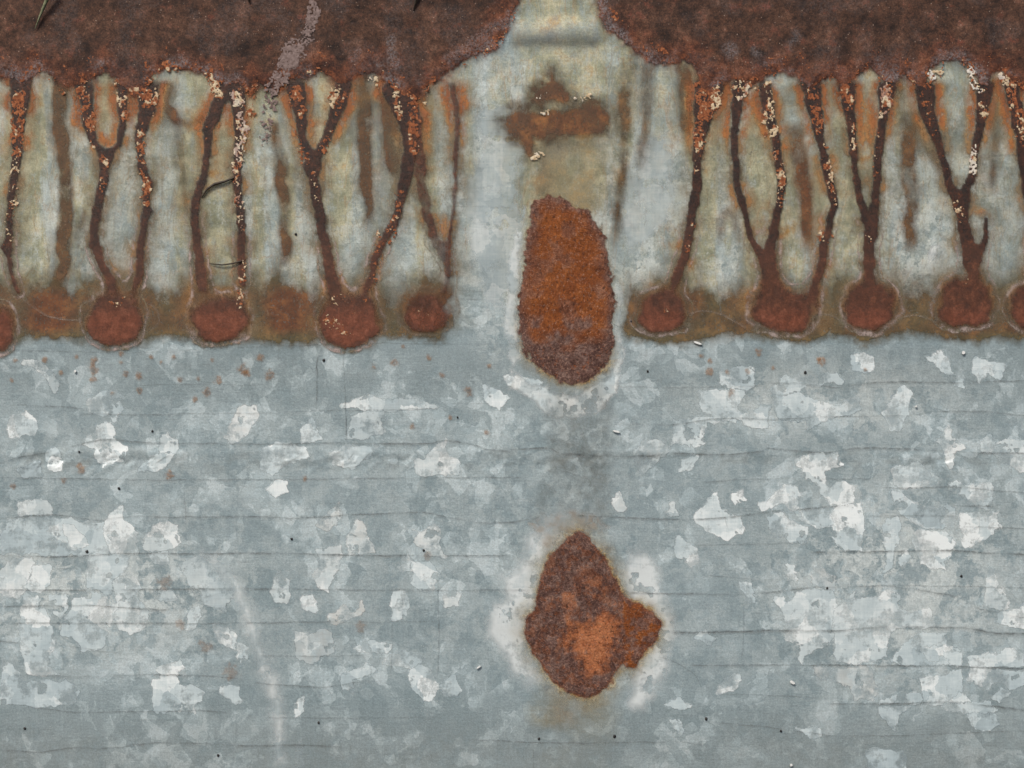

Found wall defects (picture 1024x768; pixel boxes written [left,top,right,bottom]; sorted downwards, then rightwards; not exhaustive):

corrosion [0,0,520,358]
corrosion [499,67,631,386]
corrosion [597,0,1024,338]
corrosion [523,528,664,701]